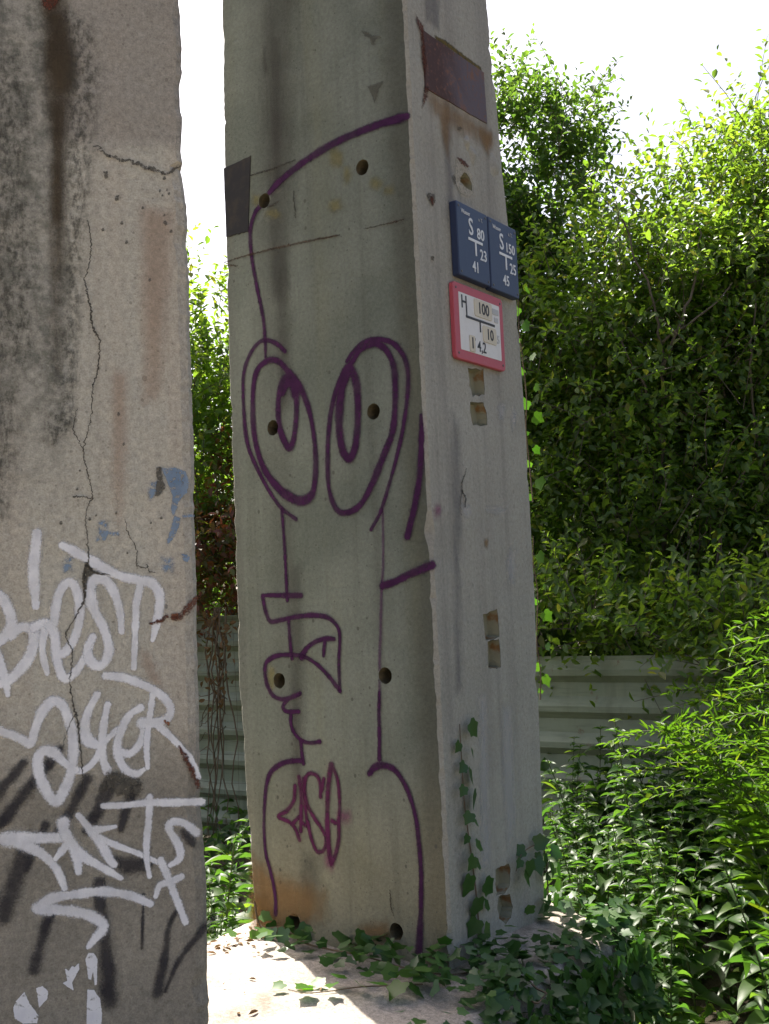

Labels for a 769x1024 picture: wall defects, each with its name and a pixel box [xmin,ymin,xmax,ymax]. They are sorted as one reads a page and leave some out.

water stain [46,0,74,268]
corrosion [417,17,491,150]
water stain [0,59,30,358]
crack [63,220,111,794]
crack [125,521,155,573]
spalling [148,467,165,499]
corrosion [150,592,202,625]
corrosion [178,745,200,789]